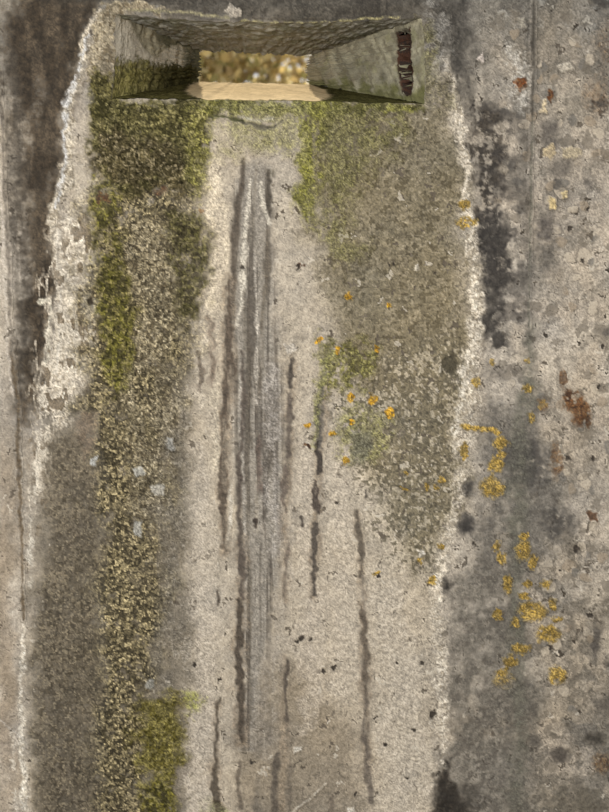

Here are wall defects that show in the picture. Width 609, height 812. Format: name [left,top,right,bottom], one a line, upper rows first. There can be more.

crack [126,6,402,23]
corrosion [580,14,609,120]
leakage [0,0,111,590]
leakage [147,0,609,812]
corrosion [536,368,594,430]